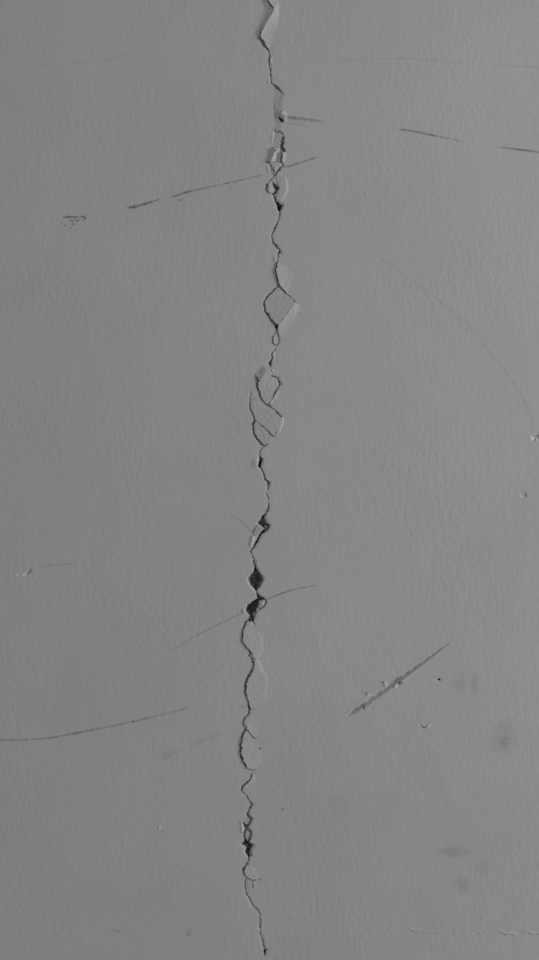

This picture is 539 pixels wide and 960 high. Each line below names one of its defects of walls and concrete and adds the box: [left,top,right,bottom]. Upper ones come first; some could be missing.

crack [239,0,300,956]
spalling [346,642,450,717]